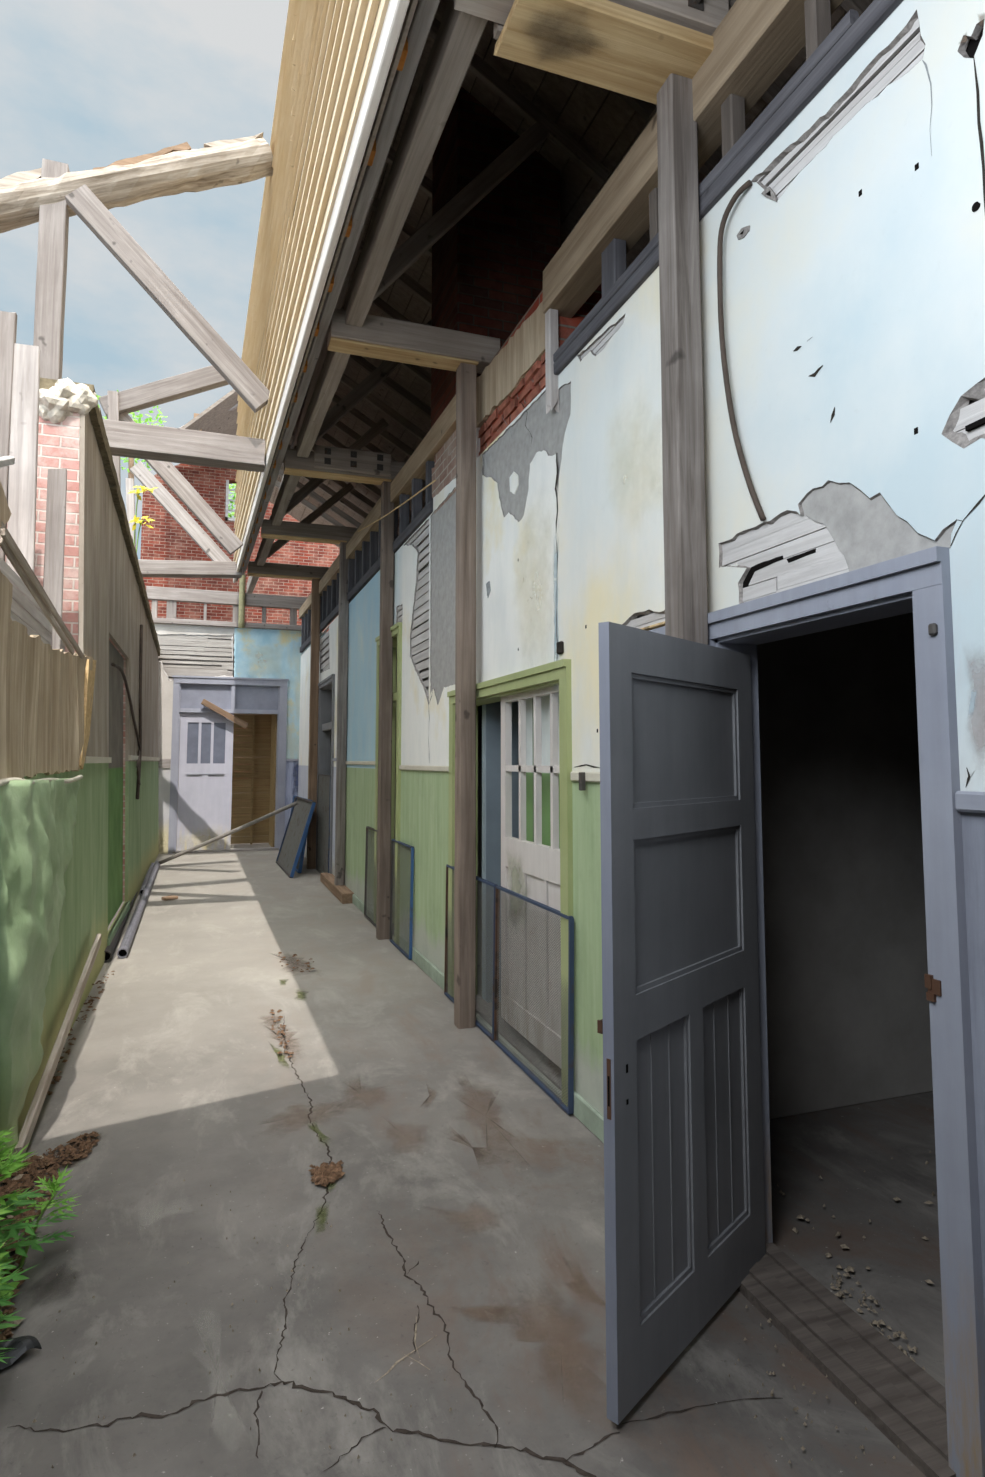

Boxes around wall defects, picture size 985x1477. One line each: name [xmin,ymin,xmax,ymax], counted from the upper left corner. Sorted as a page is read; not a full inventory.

flaking render [751,9,925,202]
crack [922,60,932,156]
crack [972,56,985,212]
peeling [478,352,571,522]
flaking render [942,378,985,449]
flaking render [718,480,957,604]
crack [950,495,985,546]
crack [11,1016,767,1477]